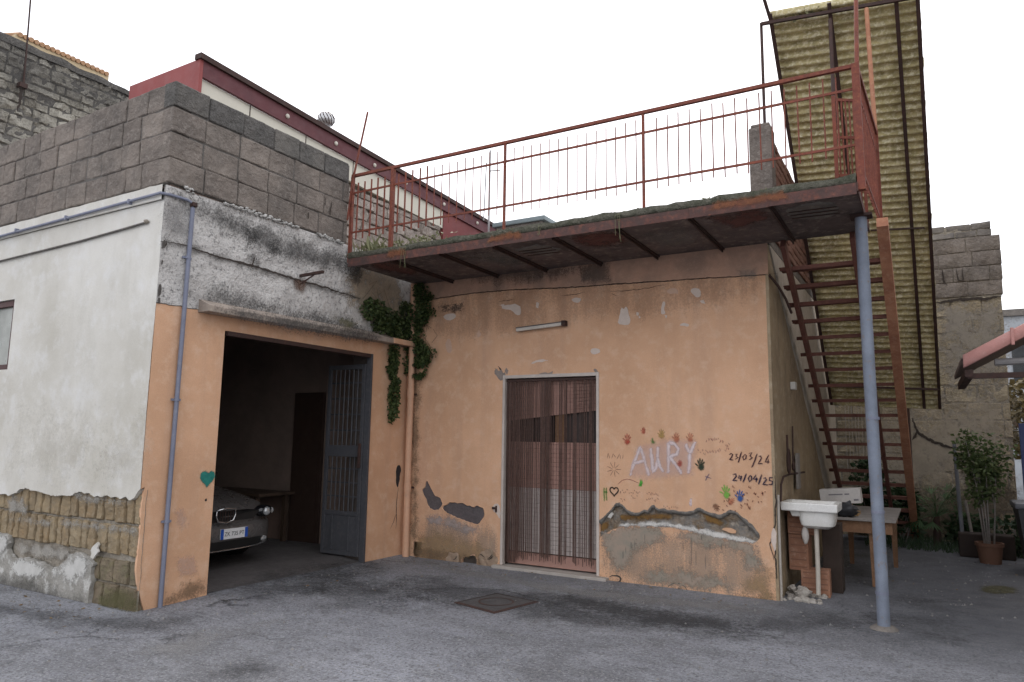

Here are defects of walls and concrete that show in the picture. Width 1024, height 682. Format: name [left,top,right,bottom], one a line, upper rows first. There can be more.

damp [164,192,404,341]
peeling [501,304,521,315]
peeling [618,307,641,325]
flaking render [0,489,148,612]
flaking render [421,480,501,525]
flaking render [599,502,777,551]